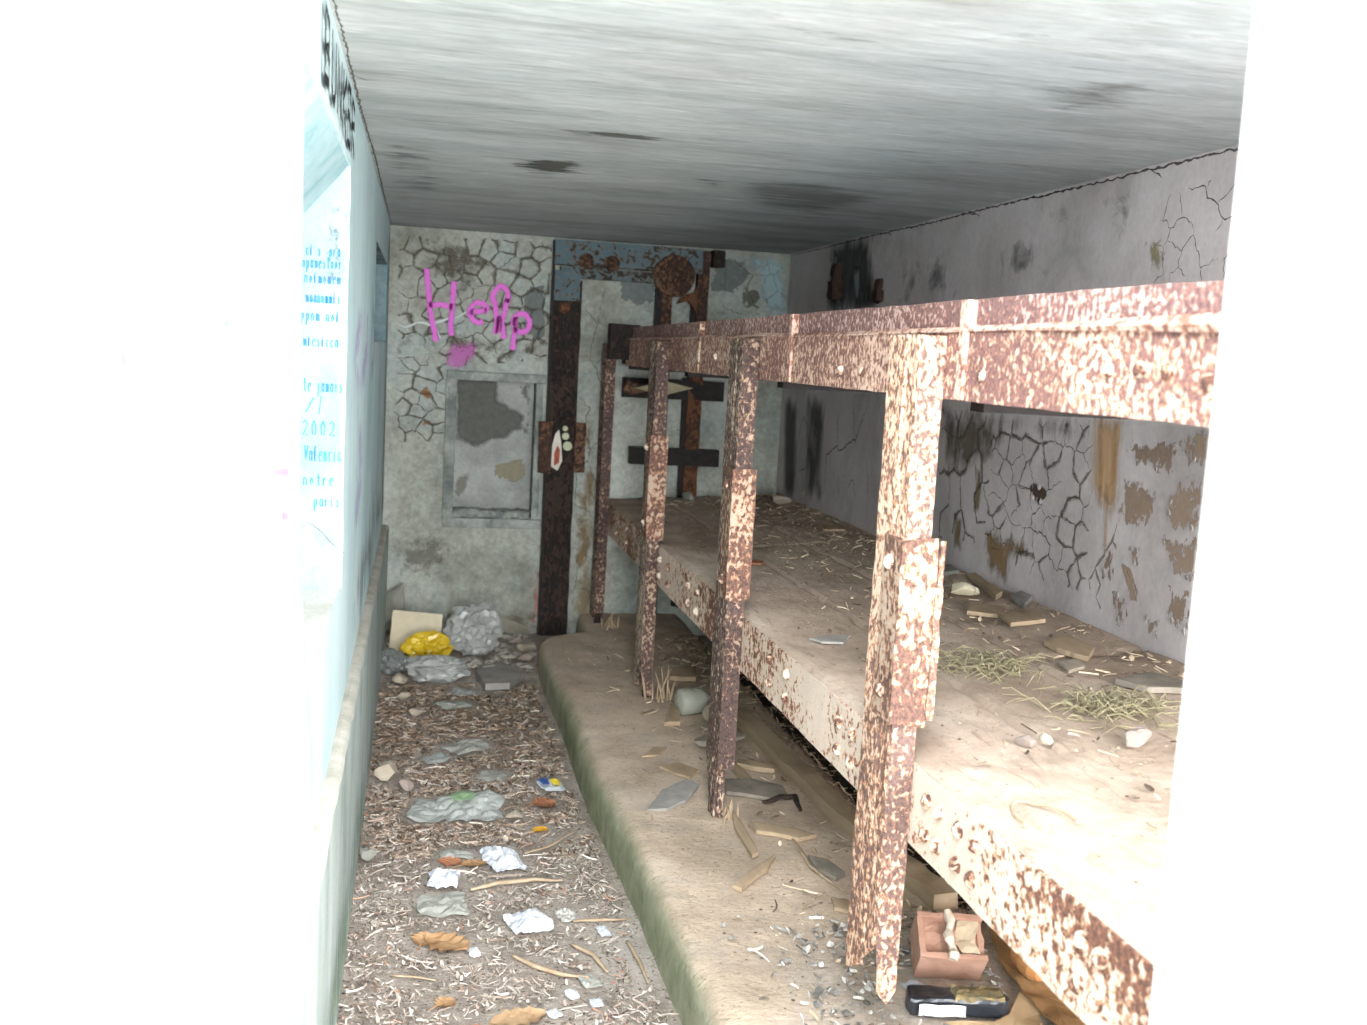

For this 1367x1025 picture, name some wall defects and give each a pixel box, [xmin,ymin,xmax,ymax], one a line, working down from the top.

crack [332,0,1241,442]
peeling [495,459,525,482]
crack [574,289,608,513]
rust [987,532,1024,580]
crack [939,410,1117,609]
rust [1095,424,1119,504]